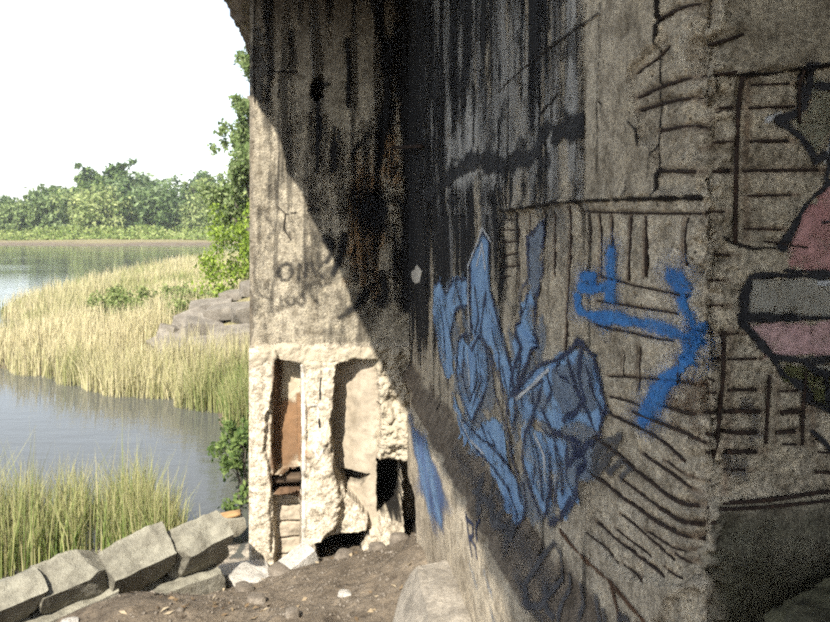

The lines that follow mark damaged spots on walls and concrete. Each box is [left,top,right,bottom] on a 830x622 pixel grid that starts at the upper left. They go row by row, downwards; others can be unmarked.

leakage [260,0,292,190]
leakage [305,0,414,313]
leakage [423,0,578,346]
leakage [338,288,369,319]
spalling [274,494,302,561]
spalling [251,340,411,538]